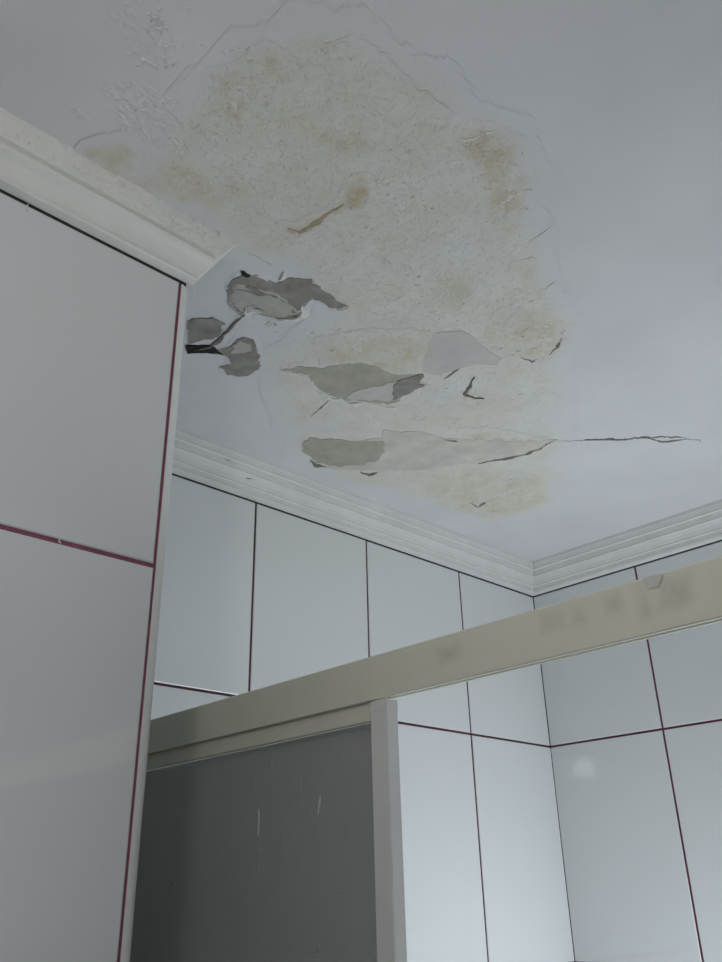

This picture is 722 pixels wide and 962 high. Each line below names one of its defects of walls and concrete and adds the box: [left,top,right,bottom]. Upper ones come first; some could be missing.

damp [73,0,589,531]
peeling [185,269,353,378]
peeling [275,329,504,409]
peeling [300,428,560,476]
crack [558,435,701,443]